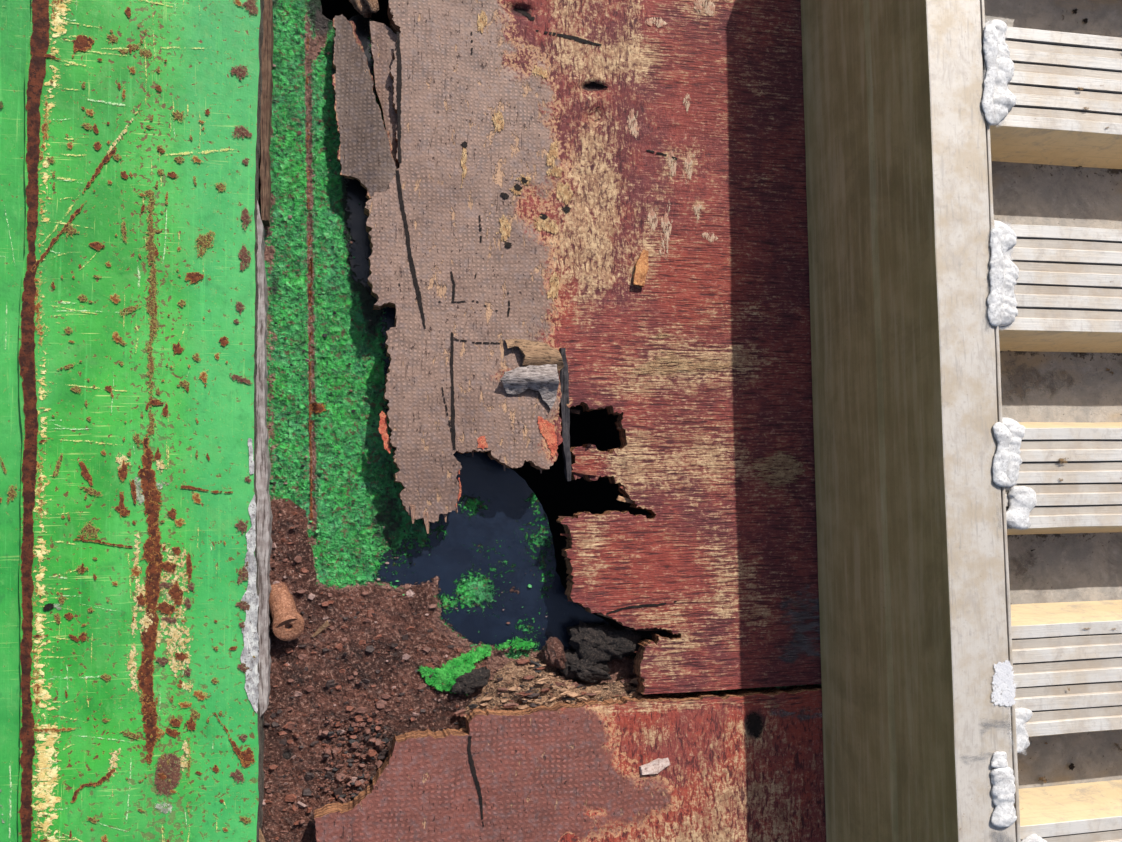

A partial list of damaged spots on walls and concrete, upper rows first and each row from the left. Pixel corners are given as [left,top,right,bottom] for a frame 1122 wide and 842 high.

peeling [645,17,667,28]
peeling [320,0,398,200]
peeling [625,108,639,140]
peeling [500,174,531,199]
peeling [668,150,696,182]
peeling [648,199,673,261]
corrosion [0,0,488,842]
peeling [378,411,391,453]
spalling [500,339,649,589]
spalling [576,602,672,638]
peeling [418,637,691,726]
crack [467,736,484,826]